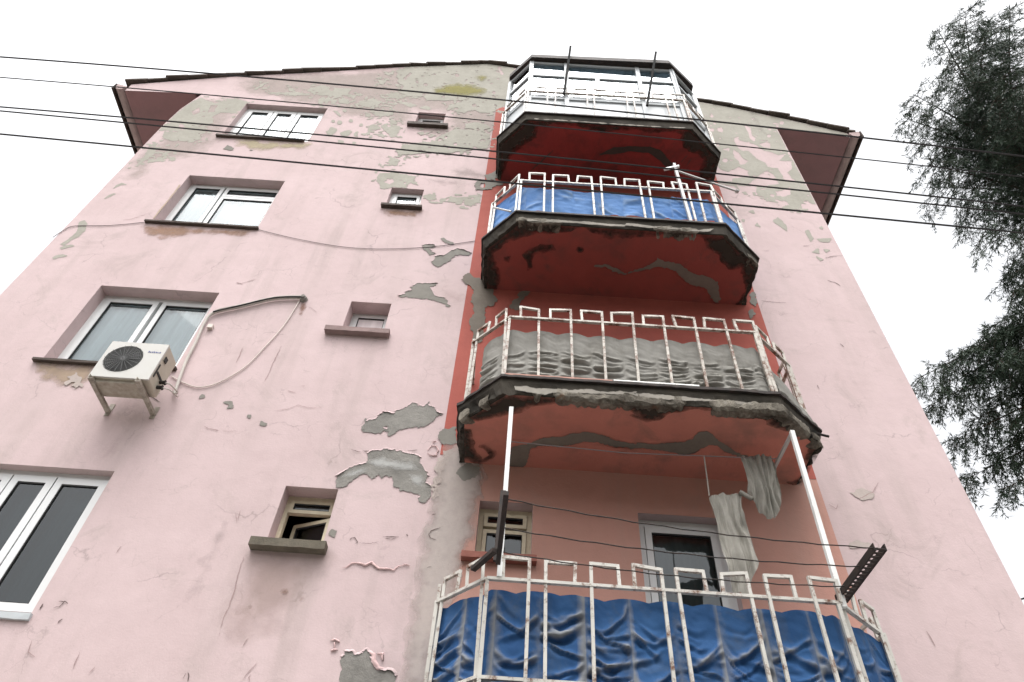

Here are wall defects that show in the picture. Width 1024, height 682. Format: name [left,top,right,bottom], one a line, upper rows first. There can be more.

peeling [128,64,514,209]
spalling [534,118,685,128]
spalling [600,146,673,171]
peeling [698,102,847,231]
spalling [516,217,712,241]
peeling [399,282,450,307]
spalling [594,258,721,304]
spalling [336,386,822,503]
flaking render [339,647,398,682]